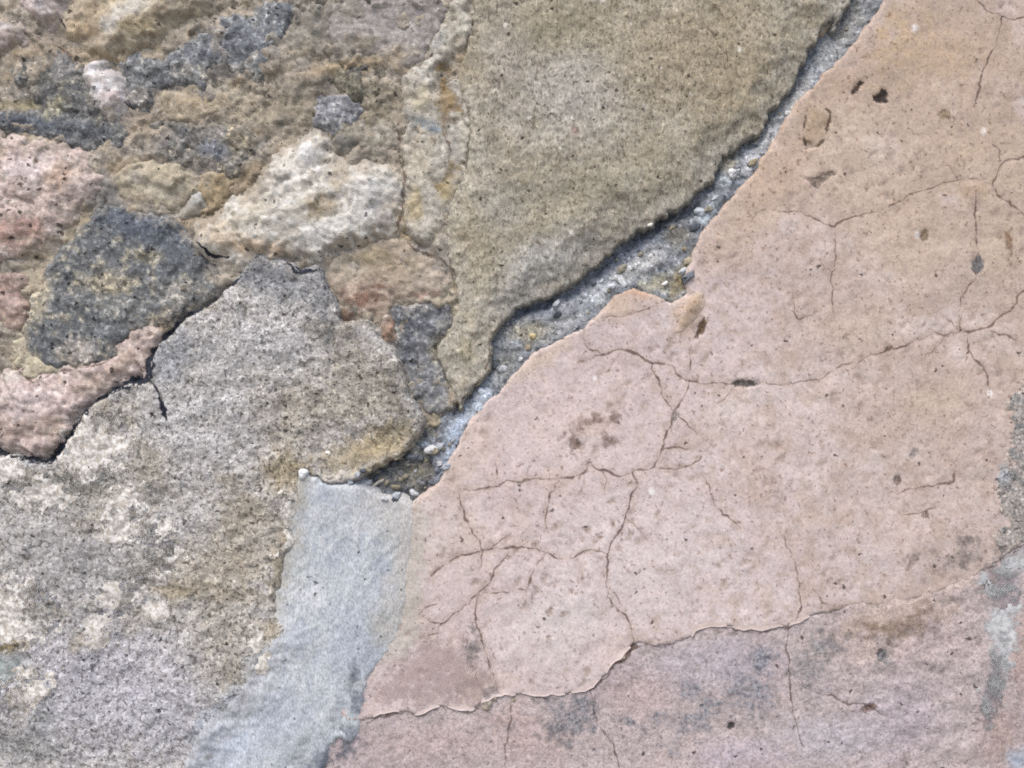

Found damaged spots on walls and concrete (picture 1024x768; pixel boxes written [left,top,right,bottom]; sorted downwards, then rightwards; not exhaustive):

crack [974,1,1024,105]
crack [0,242,241,464]
crack [286,262,317,274]
crack [396,122,454,285]
crack [755,143,1024,385]
crack [419,305,739,759]
peeling [326,386,1024,768]
crack [784,536,891,746]
crack [897,464,956,515]